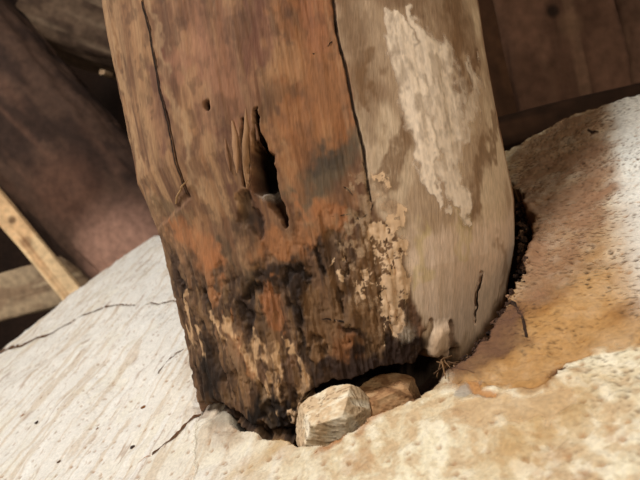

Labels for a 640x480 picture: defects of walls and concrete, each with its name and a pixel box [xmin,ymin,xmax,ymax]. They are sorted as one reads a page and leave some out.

crack [141,1,187,194]
crack [312,2,373,220]
peeling [371,172,392,188]
peeling [355,203,411,338]
crack [0,300,176,353]
peeling [287,387,316,424]
crack [142,407,206,460]